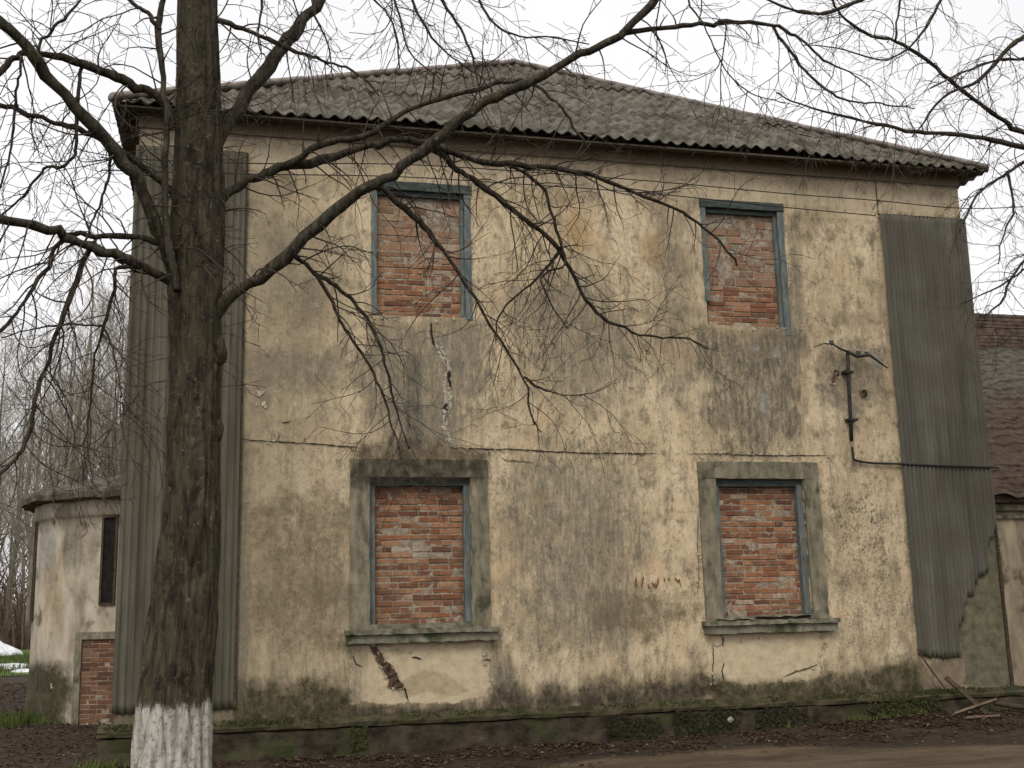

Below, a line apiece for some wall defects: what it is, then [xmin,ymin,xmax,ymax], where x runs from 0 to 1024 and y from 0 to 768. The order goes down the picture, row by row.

leakage [698,328,801,462]
leakage [509,434,684,645]
leakage [24,664,73,724]
leakage [234,678,475,720]
crack [353,644,421,701]
leakage [493,653,922,708]